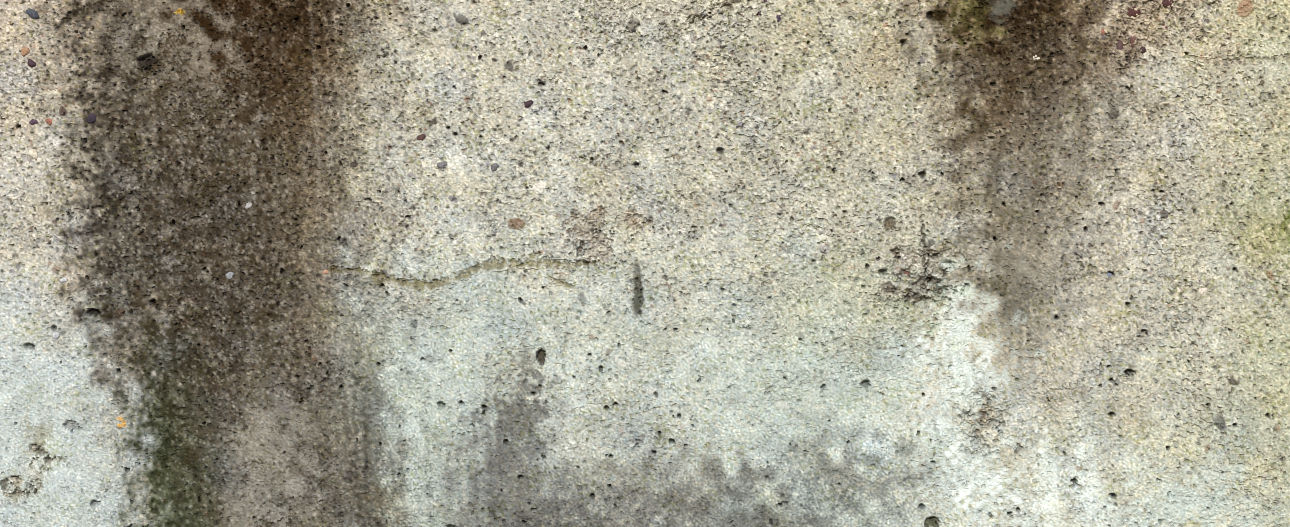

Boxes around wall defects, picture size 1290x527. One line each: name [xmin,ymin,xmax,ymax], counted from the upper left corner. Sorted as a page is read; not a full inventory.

crack [326,250,597,293]
water stain [487,243,543,260]
water stain [132,355,199,527]
water stain [294,429,311,447]
water stain [538,455,553,466]
water stain [170,485,220,527]
water stain [313,469,357,527]
water stain [677,484,691,497]